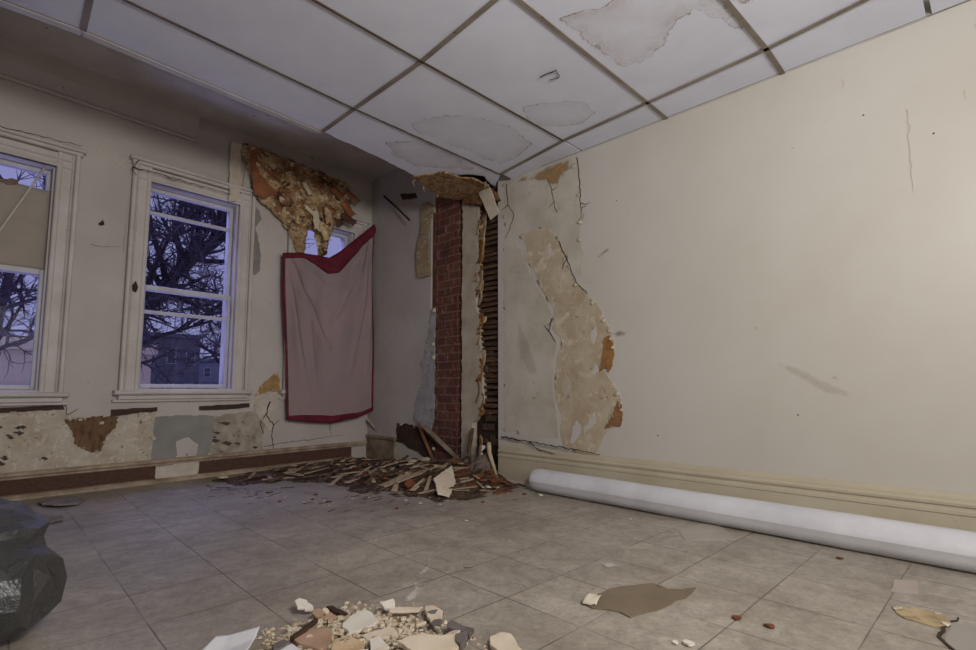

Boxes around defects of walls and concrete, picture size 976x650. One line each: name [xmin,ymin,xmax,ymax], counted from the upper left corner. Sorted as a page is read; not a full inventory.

peeling [0,409,156,473]
peeling [253,208,262,275]
flaking render [396,193,484,461]
peeling [492,156,623,456]